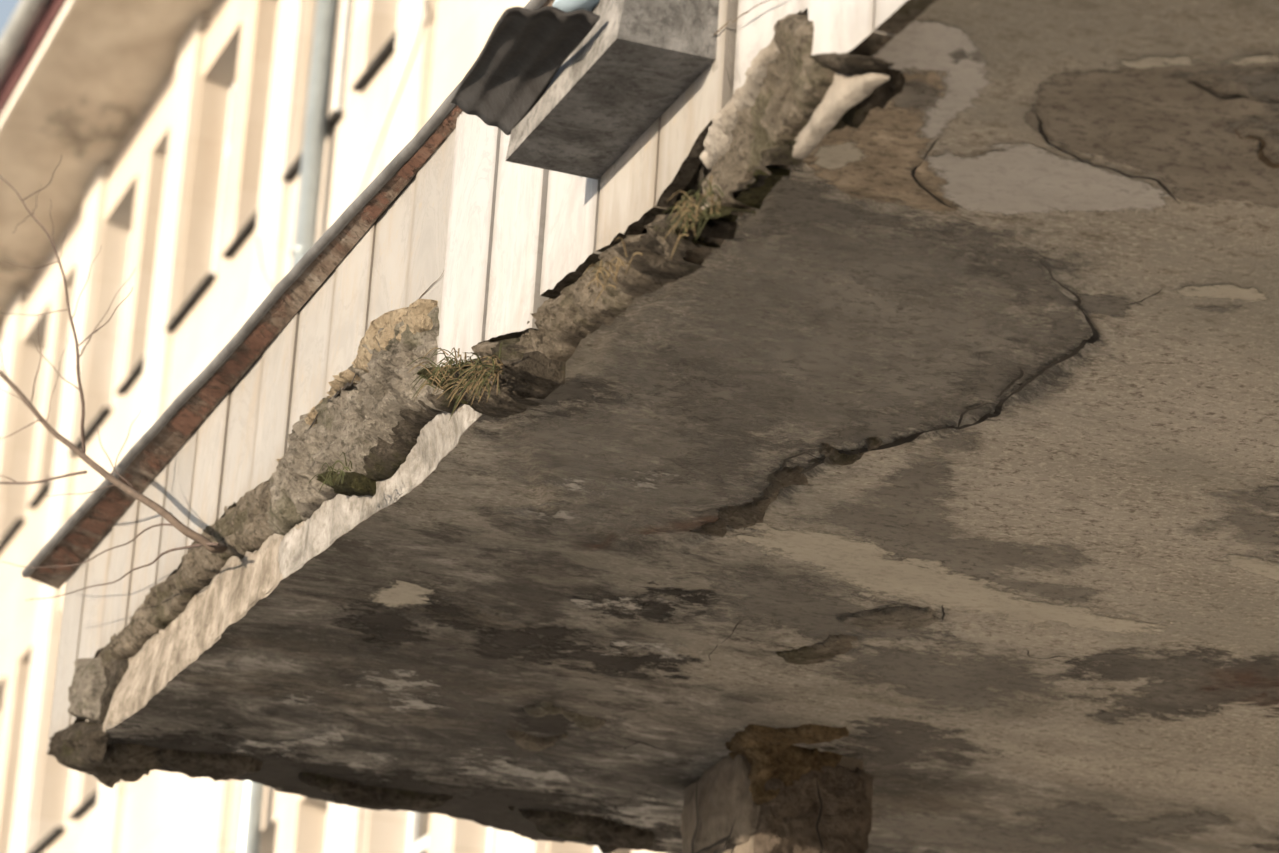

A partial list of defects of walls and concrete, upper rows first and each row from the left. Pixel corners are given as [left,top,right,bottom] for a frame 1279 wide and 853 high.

flaking render [1115,55,1201,69]
flaking render [1220,55,1279,68]
spalling [49,14,1173,788]
crack [744,261,1099,530]
water stain [107,162,1279,853]
spalling [298,772,453,810]
spalling [509,806,655,853]
spalling [681,754,873,853]